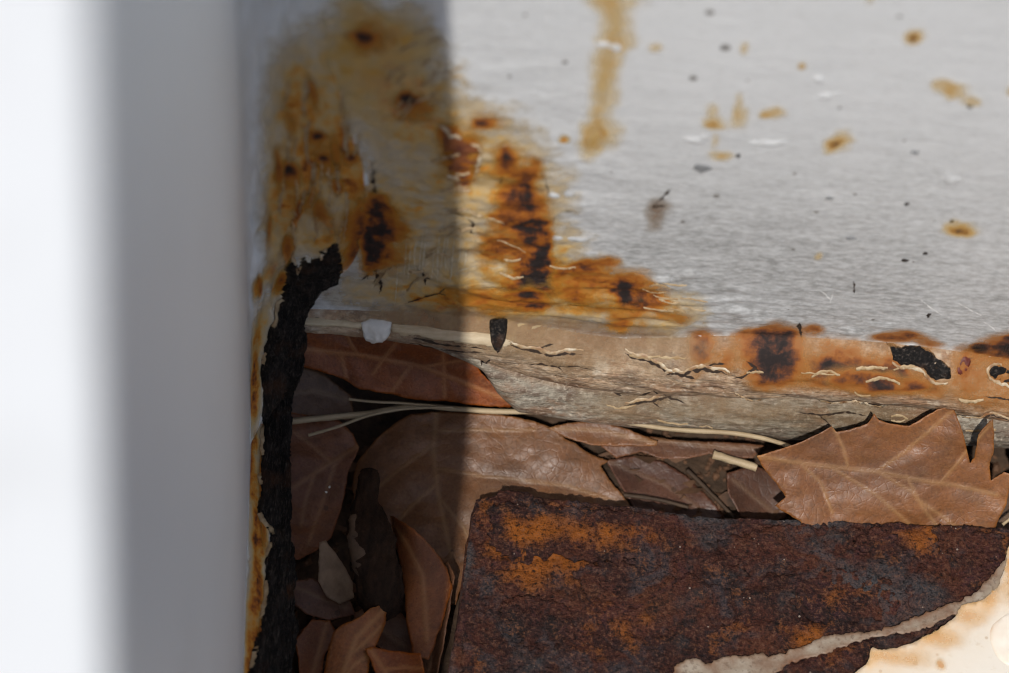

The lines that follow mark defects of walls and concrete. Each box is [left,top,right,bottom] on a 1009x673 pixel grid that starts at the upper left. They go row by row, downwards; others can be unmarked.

crack [508,340,591,388]
corrosion [244,0,1009,673]
crack [614,348,764,407]
crack [800,399,891,423]
crack [956,397,1009,421]
spalling [448,490,1009,673]